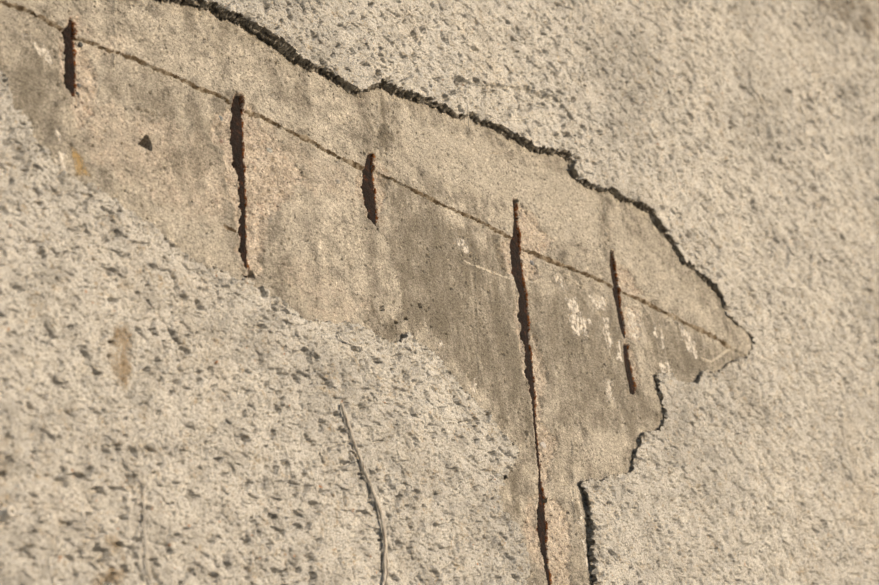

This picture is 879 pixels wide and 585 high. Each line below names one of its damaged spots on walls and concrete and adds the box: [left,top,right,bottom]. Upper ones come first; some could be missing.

rust [61,20,78,108]
peeling [170,0,468,120]
spalling [208,106,242,232]
rust [229,96,250,278]
spalling [238,102,307,280]
crack [0,0,731,349]
rust [360,153,379,227]
peeling [469,111,739,326]
rust [509,200,552,585]
spalling [528,331,559,488]
rust [609,251,637,395]
spalling [544,497,572,585]